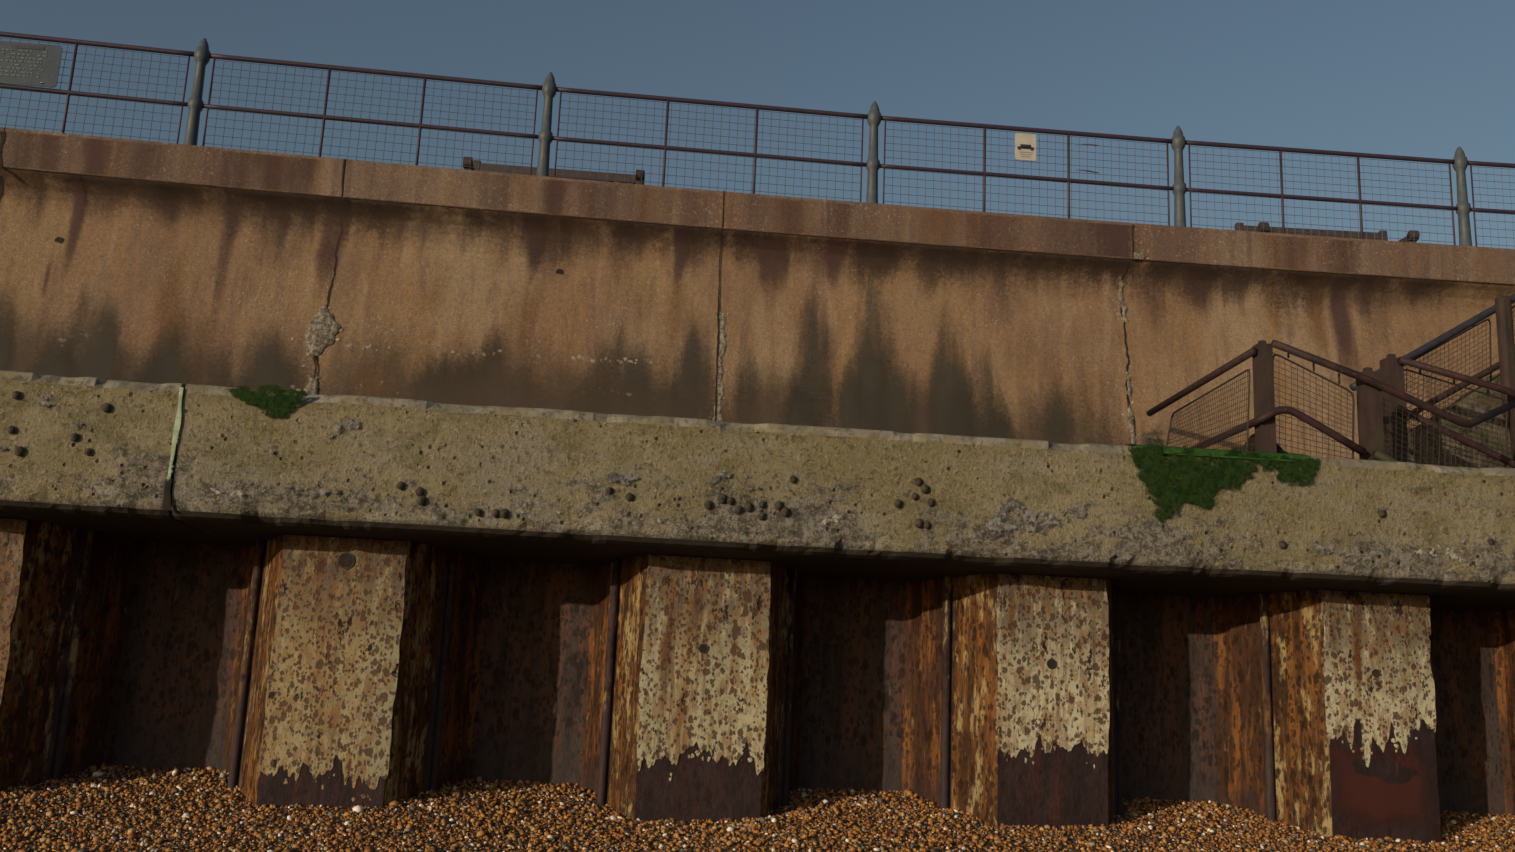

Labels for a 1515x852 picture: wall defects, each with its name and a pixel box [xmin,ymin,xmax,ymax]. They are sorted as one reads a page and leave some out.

crack [0,131,8,199]
crack [326,159,346,310]
water stain [0,279,307,393]
crack [310,355,318,395]
spalling [290,305,502,395]
water stain [328,287,1073,444]
crack [1120,225,1136,438]
peeling [259,534,408,802]
peeling [637,555,771,781]
peeling [995,573,1110,769]
peeling [1322,590,1436,767]